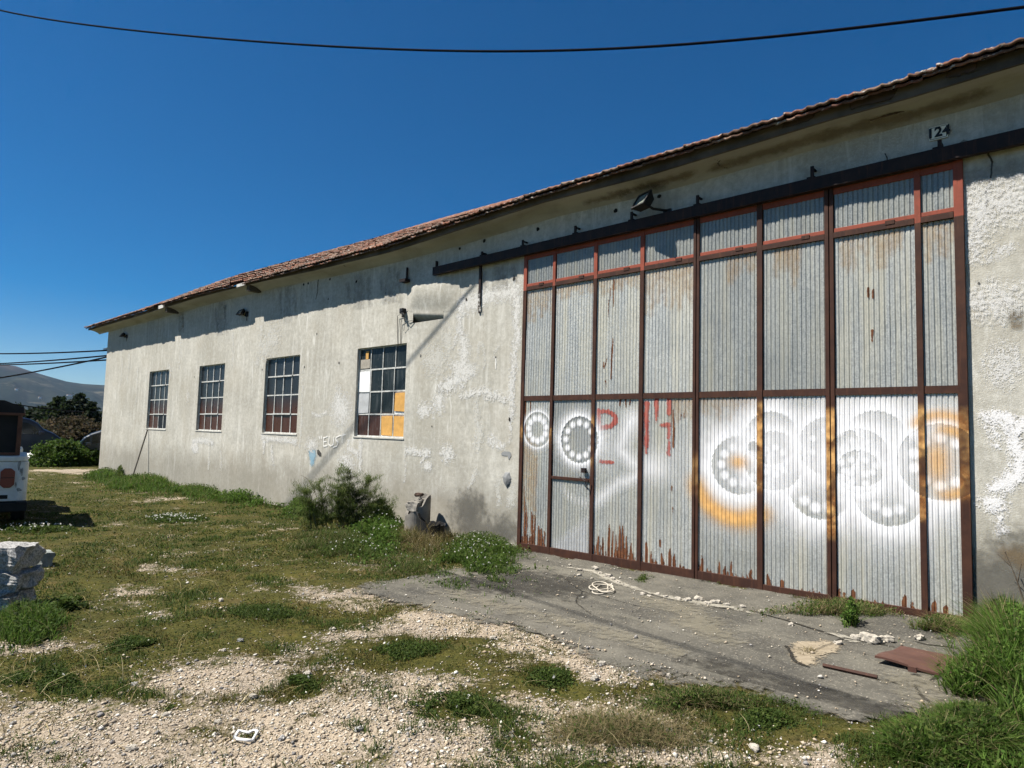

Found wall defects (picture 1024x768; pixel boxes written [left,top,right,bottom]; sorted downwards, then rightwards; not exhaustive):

rust [521,486,546,546]
peeling [973,493,1011,536]
rust [594,524,684,568]
rust [698,555,753,579]